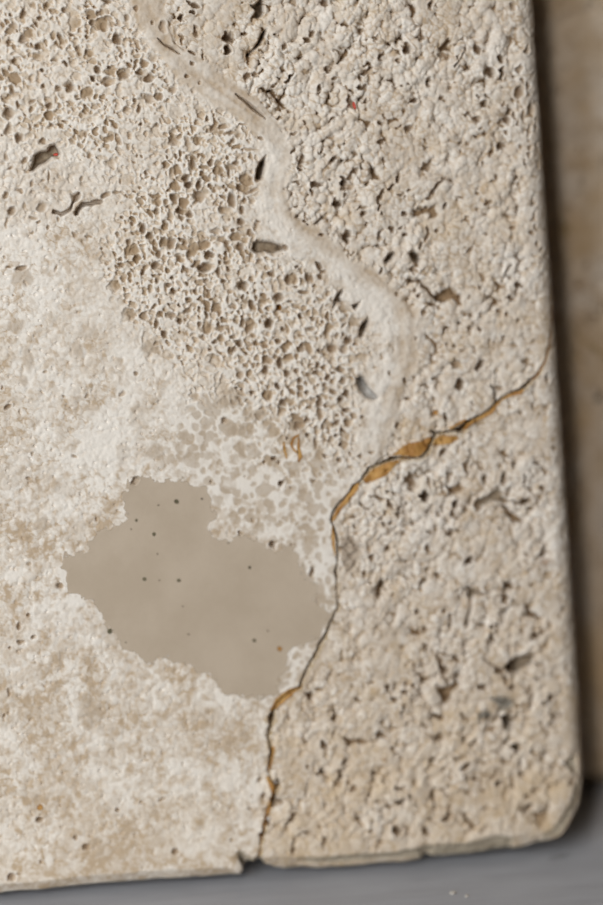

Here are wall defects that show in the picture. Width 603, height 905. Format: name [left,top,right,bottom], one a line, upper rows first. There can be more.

crack [258,304,552,856]